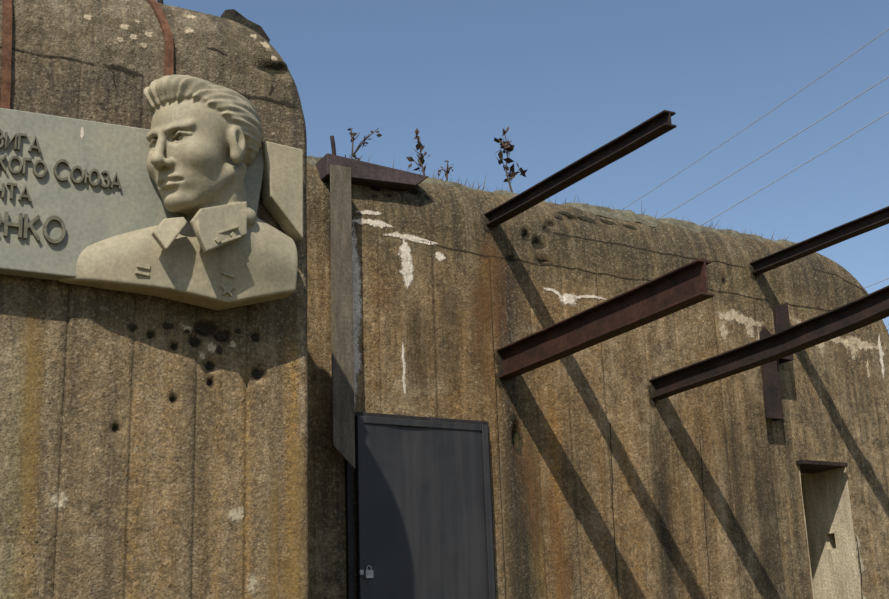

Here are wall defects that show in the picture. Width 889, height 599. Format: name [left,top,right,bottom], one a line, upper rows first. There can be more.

spalling [163,321,241,388]